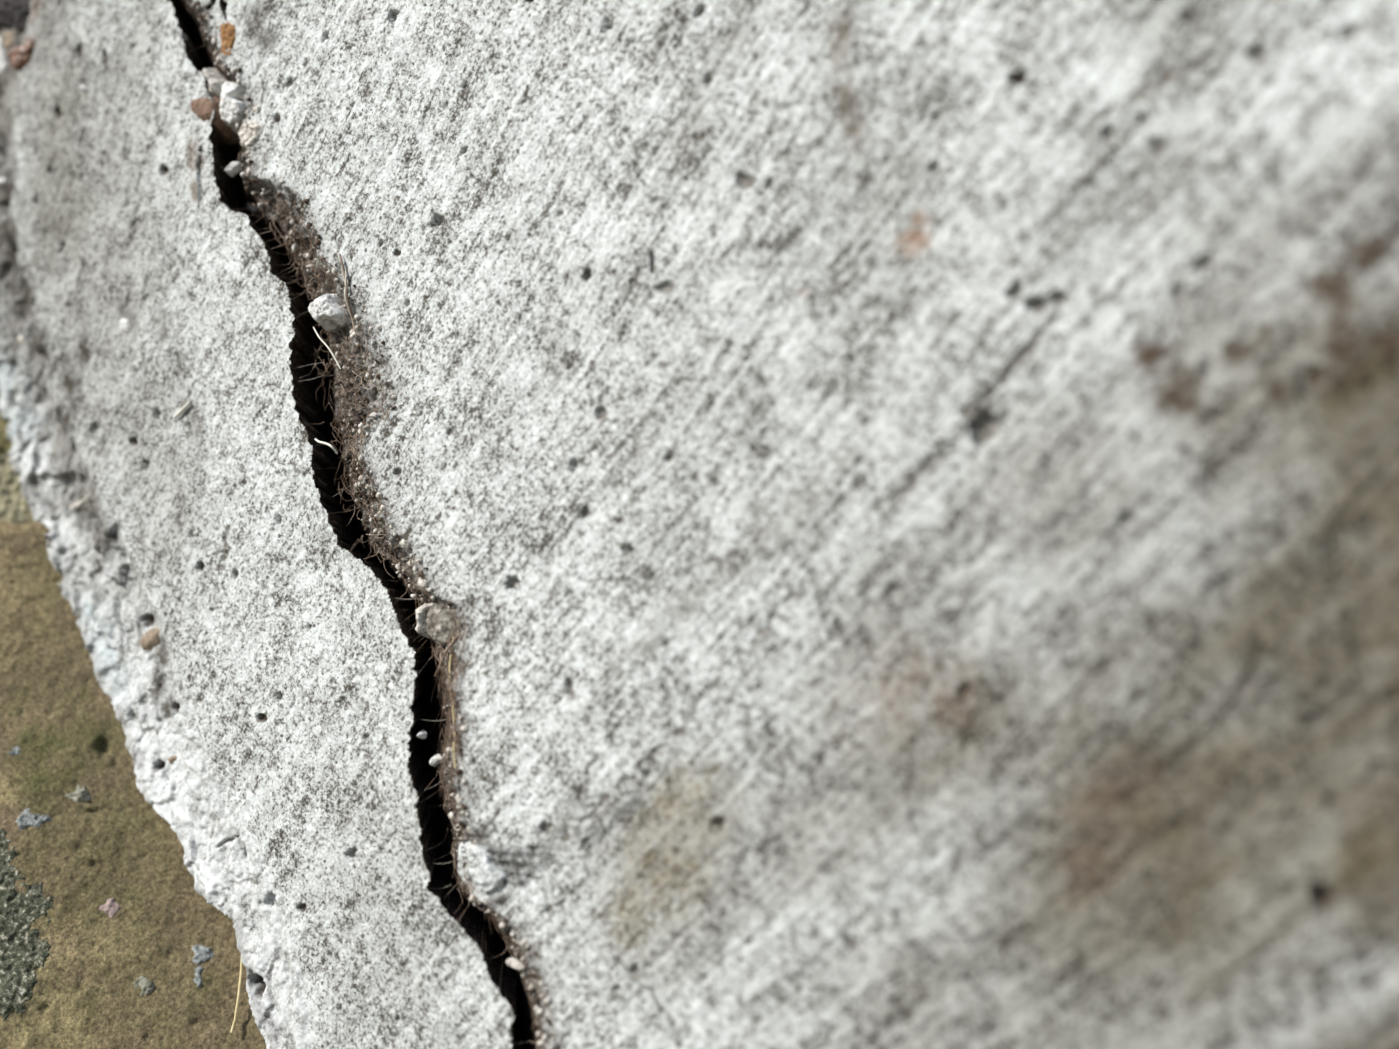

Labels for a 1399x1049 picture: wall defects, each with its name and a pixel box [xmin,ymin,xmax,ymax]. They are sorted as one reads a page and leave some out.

crack [169,0,537,1049]